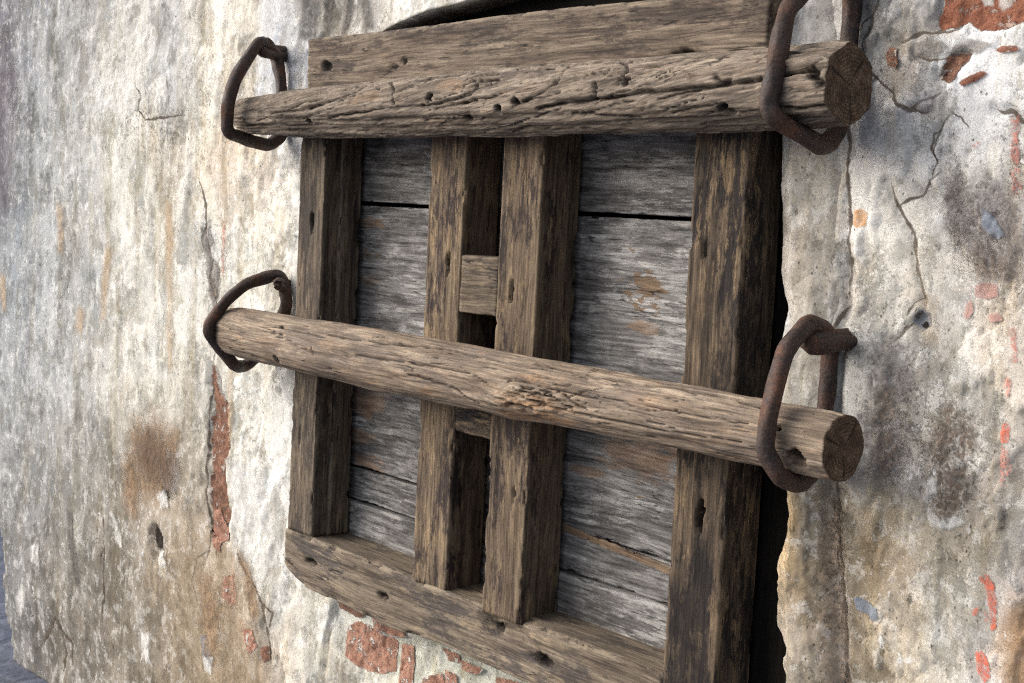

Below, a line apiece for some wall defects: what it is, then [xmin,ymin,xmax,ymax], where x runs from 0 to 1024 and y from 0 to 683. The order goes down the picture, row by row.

spalling [886,0,1024,86]
crack [120,83,183,127]
crack [859,0,969,346]
flaking render [209,365,279,583]
spalling [221,574,237,607]
spalling [243,628,270,662]
spalling [318,602,483,683]